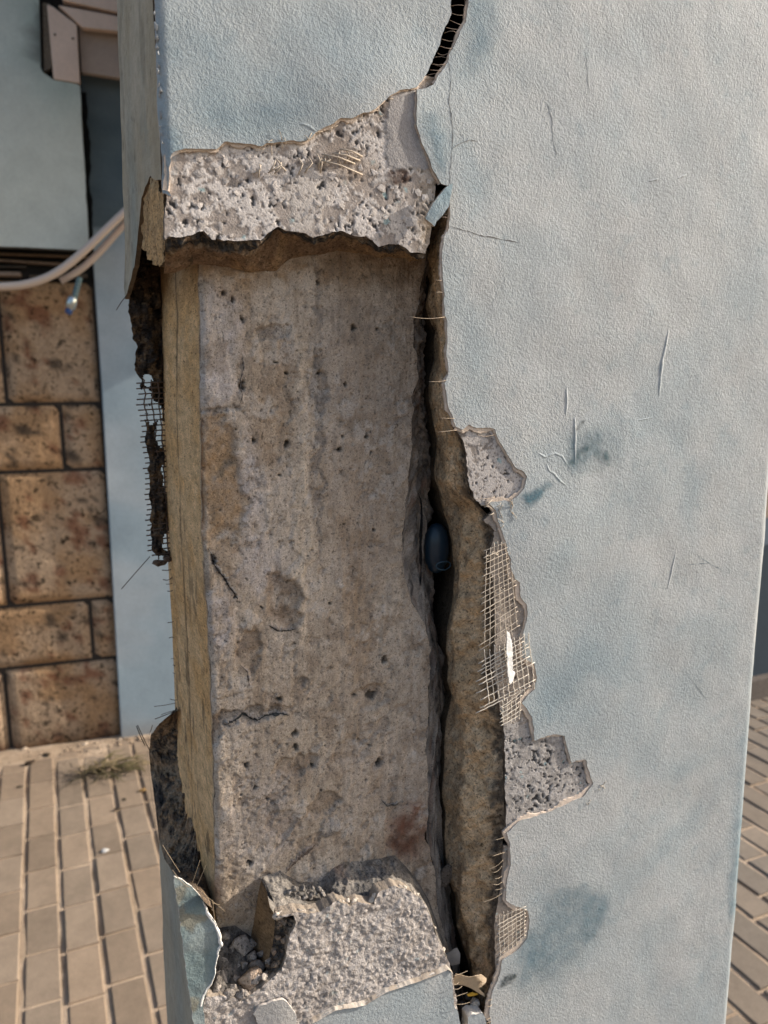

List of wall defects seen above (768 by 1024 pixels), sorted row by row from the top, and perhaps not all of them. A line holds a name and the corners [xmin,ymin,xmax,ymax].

crack [227,666,290,724]
peeling [116,76,453,592]
spalling [136,699,458,1024]
crack [401,0,518,1024]
spalling [451,425,606,1024]
leakage [526,490,544,503]